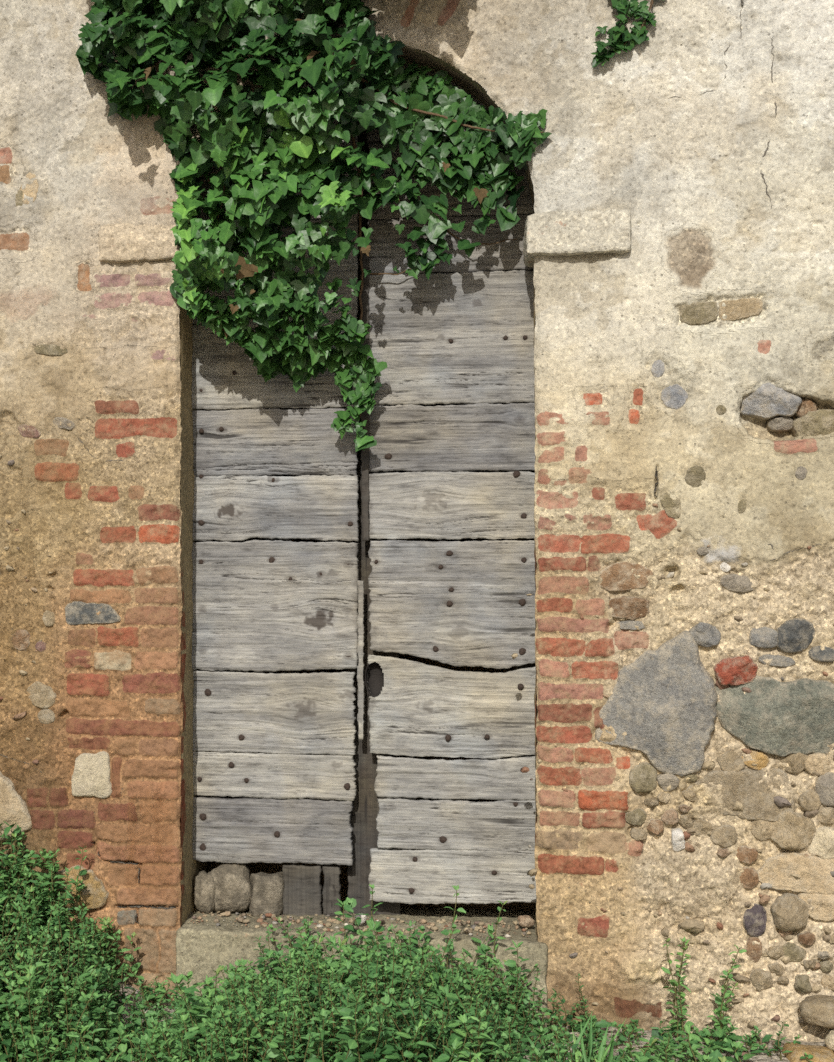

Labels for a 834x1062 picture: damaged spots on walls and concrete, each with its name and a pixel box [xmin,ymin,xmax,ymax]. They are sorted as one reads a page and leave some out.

crack [668,0,743,99]
crack [760,141,772,208]
spalling [573,346,696,434]
flaking render [740,382,834,437]
flaking render [685,465,706,488]
flaking render [795,466,807,480]
spalling [0,385,183,1001]
spalling [534,472,834,1042]